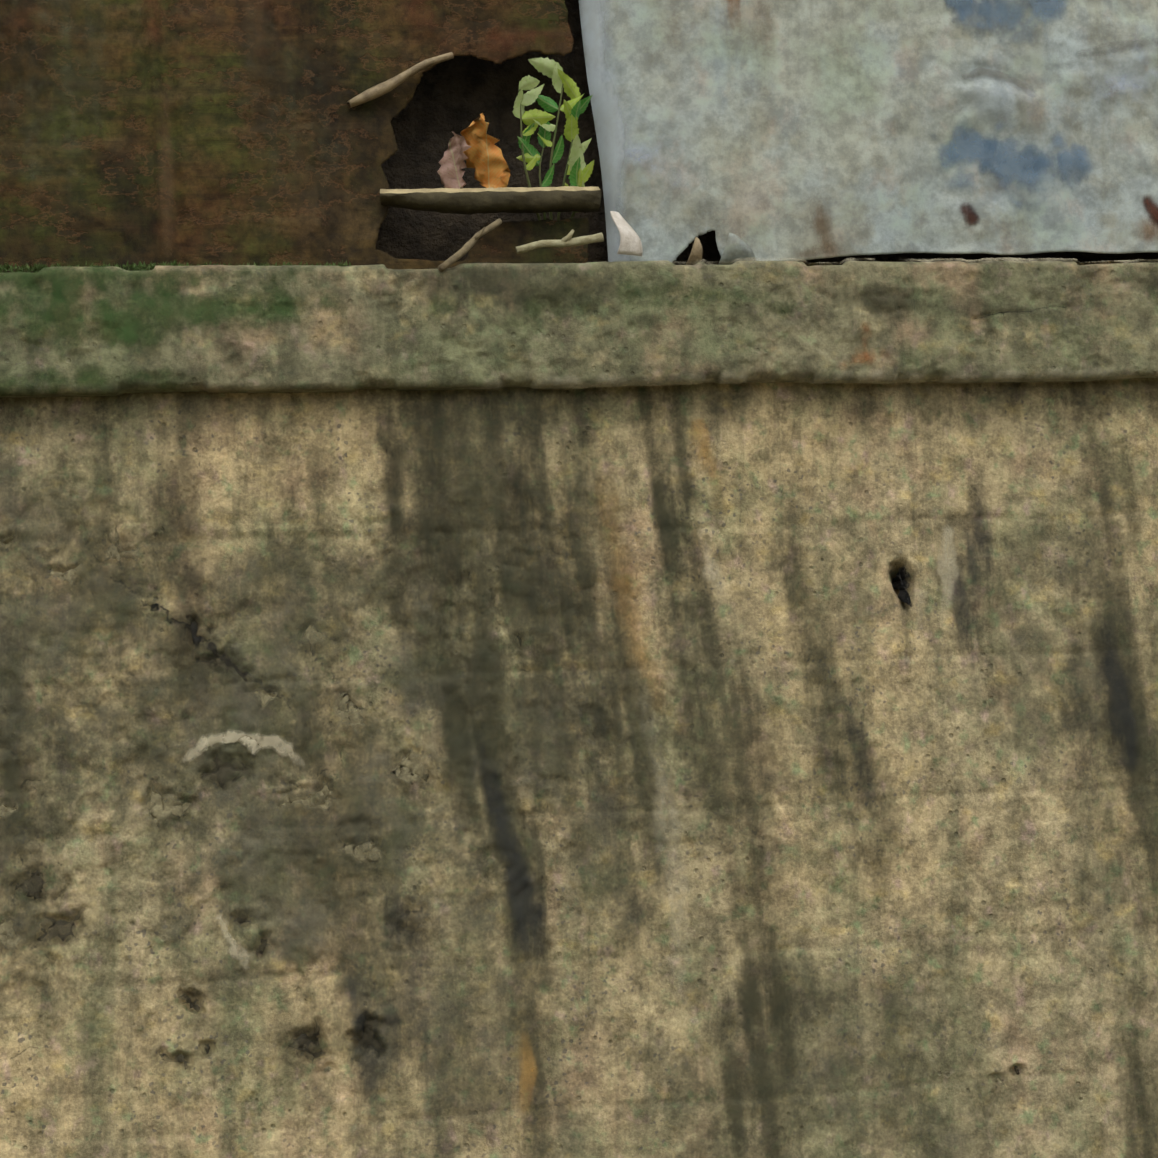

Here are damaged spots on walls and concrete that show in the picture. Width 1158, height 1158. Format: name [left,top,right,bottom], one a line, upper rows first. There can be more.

rust [961,204,979,223]
rust [1143,196,1158,224]
damp [437,414,556,684]
crack [114,580,289,702]
damp [1097,595,1155,890]
spalling [0,918,22,946]
damp [444,677,548,1112]
spalling [290,1029,331,1072]